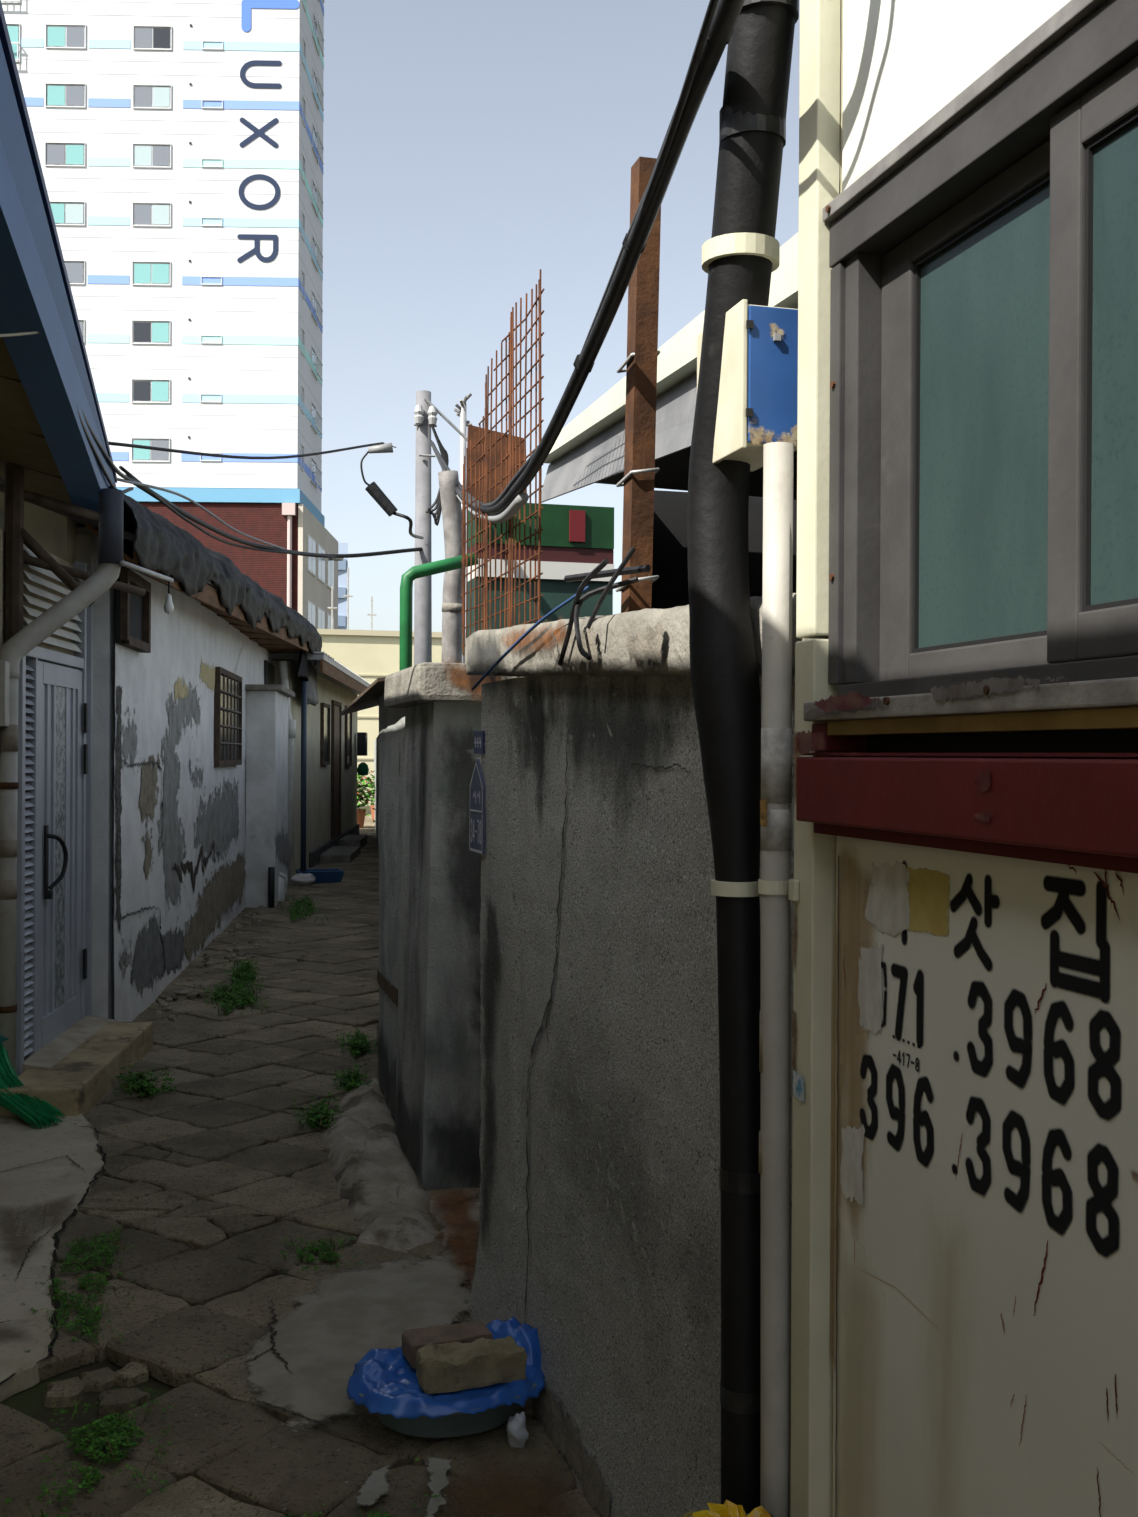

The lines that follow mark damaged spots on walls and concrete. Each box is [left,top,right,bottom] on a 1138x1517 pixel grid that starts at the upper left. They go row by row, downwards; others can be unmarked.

peeling [114,662,246,997]
damp [377,731,499,1240]
crack [525,726,569,1323]
damp [515,680,672,806]